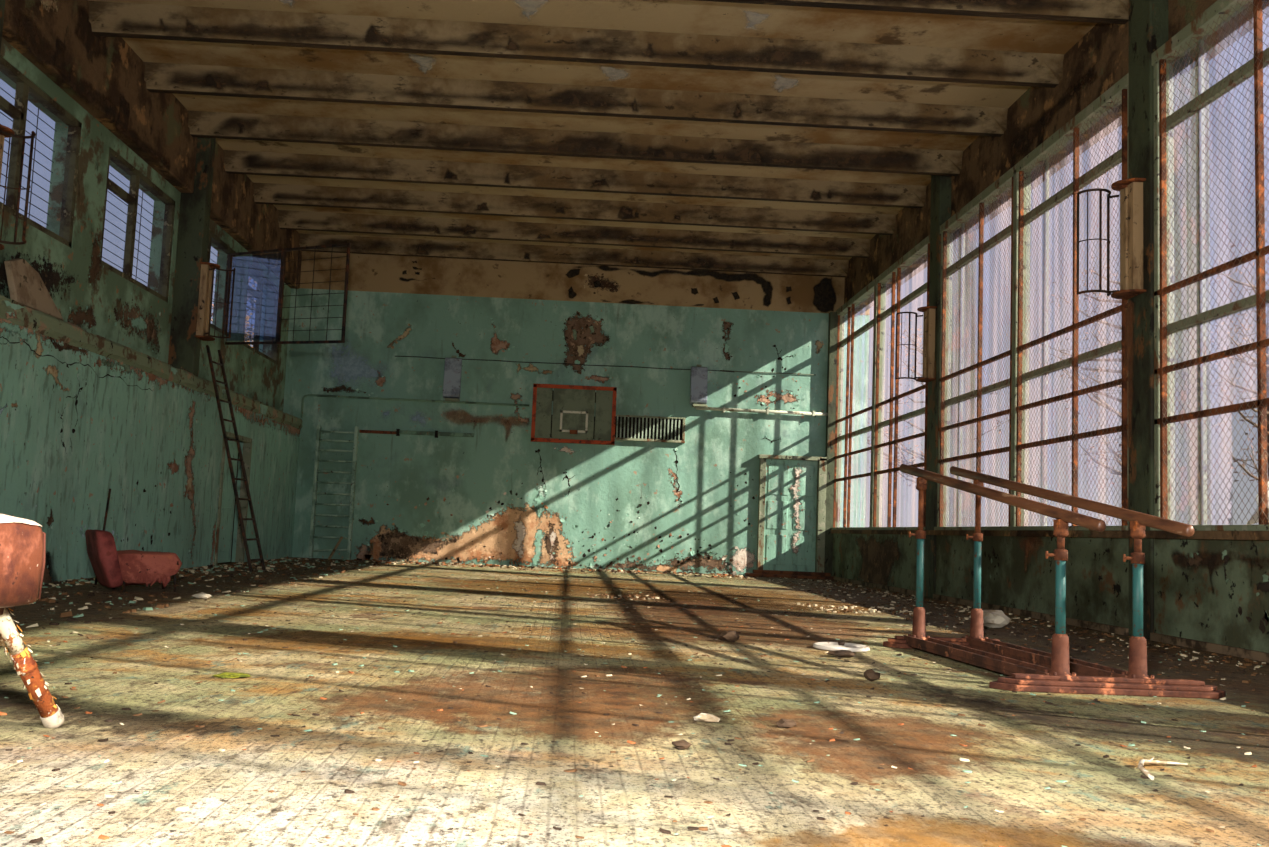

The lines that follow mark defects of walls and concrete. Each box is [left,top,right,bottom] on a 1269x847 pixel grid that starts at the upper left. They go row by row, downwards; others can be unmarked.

damp [16,9,170,171]
damp [171,73,332,91]
damp [118,19,519,72]
damp [477,90,651,112]
damp [291,129,920,169]
damp [568,39,889,92]
damp [825,115,975,126]
damp [320,221,496,281]
damp [526,206,851,313]
peeling [510,311,613,423]
flaking render [0,312,300,564]
flaking render [354,466,757,575]